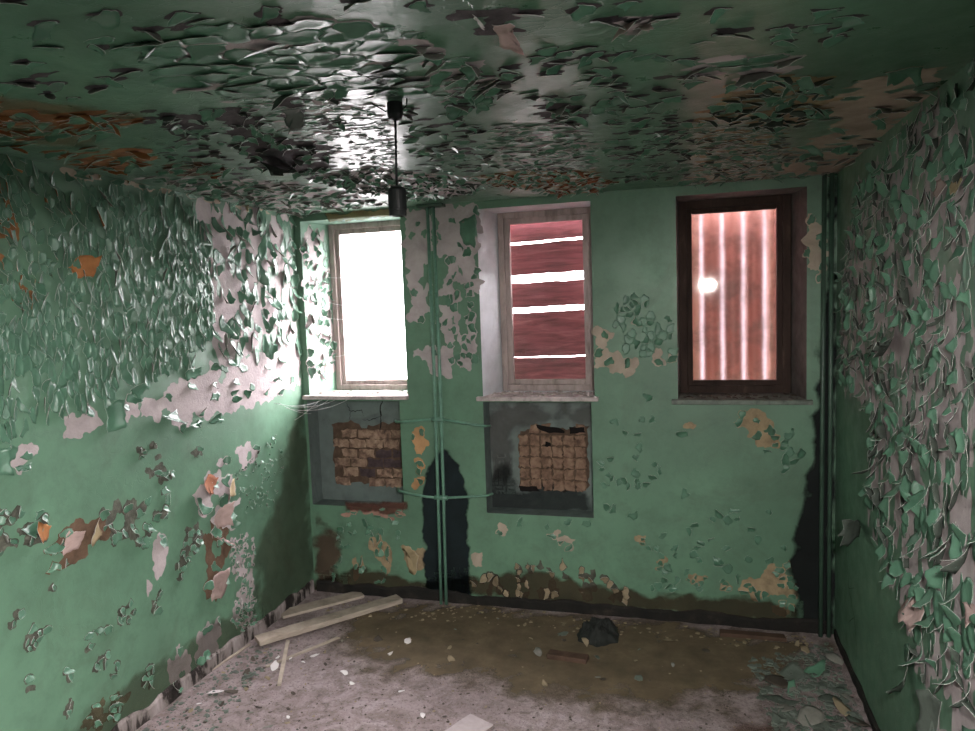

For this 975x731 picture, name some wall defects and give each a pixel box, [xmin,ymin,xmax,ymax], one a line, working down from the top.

peeling [690,7,755,46]
peeling [0,0,690,475]
flaking render [331,420,429,490]
peeling [518,45,975,731]
flaking render [0,435,284,694]
peeling [80,663,155,731]
water stain [316,567,810,714]